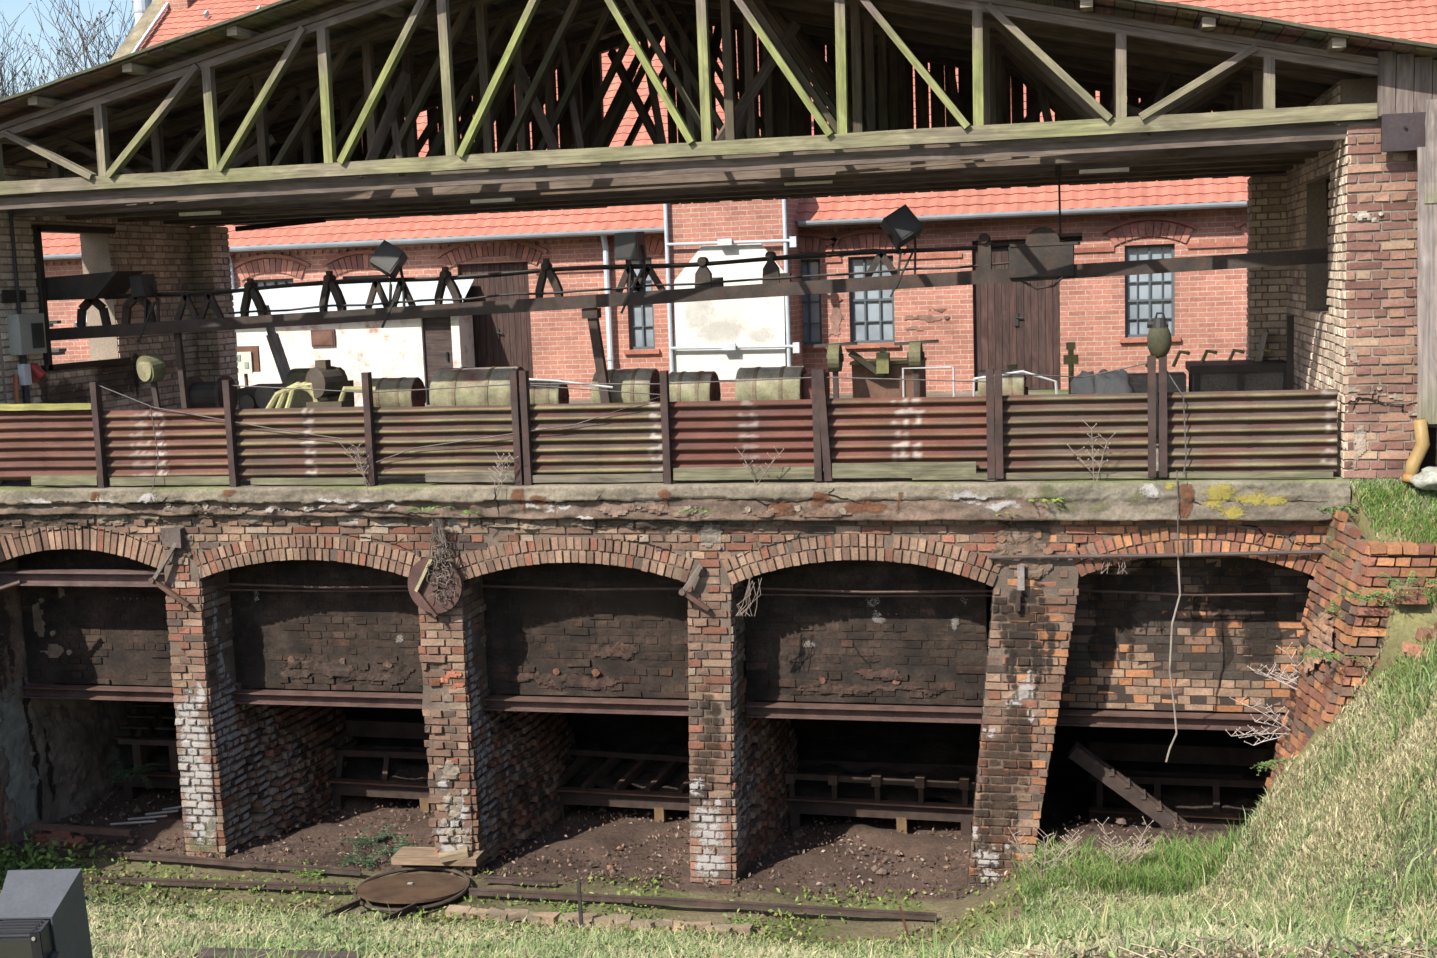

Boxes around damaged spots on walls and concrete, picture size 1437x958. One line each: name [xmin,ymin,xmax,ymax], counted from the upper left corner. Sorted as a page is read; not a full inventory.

leakage [173,593,310,850]
leakage [436,608,549,857]
leakage [690,629,756,877]
leakage [973,618,1056,887]